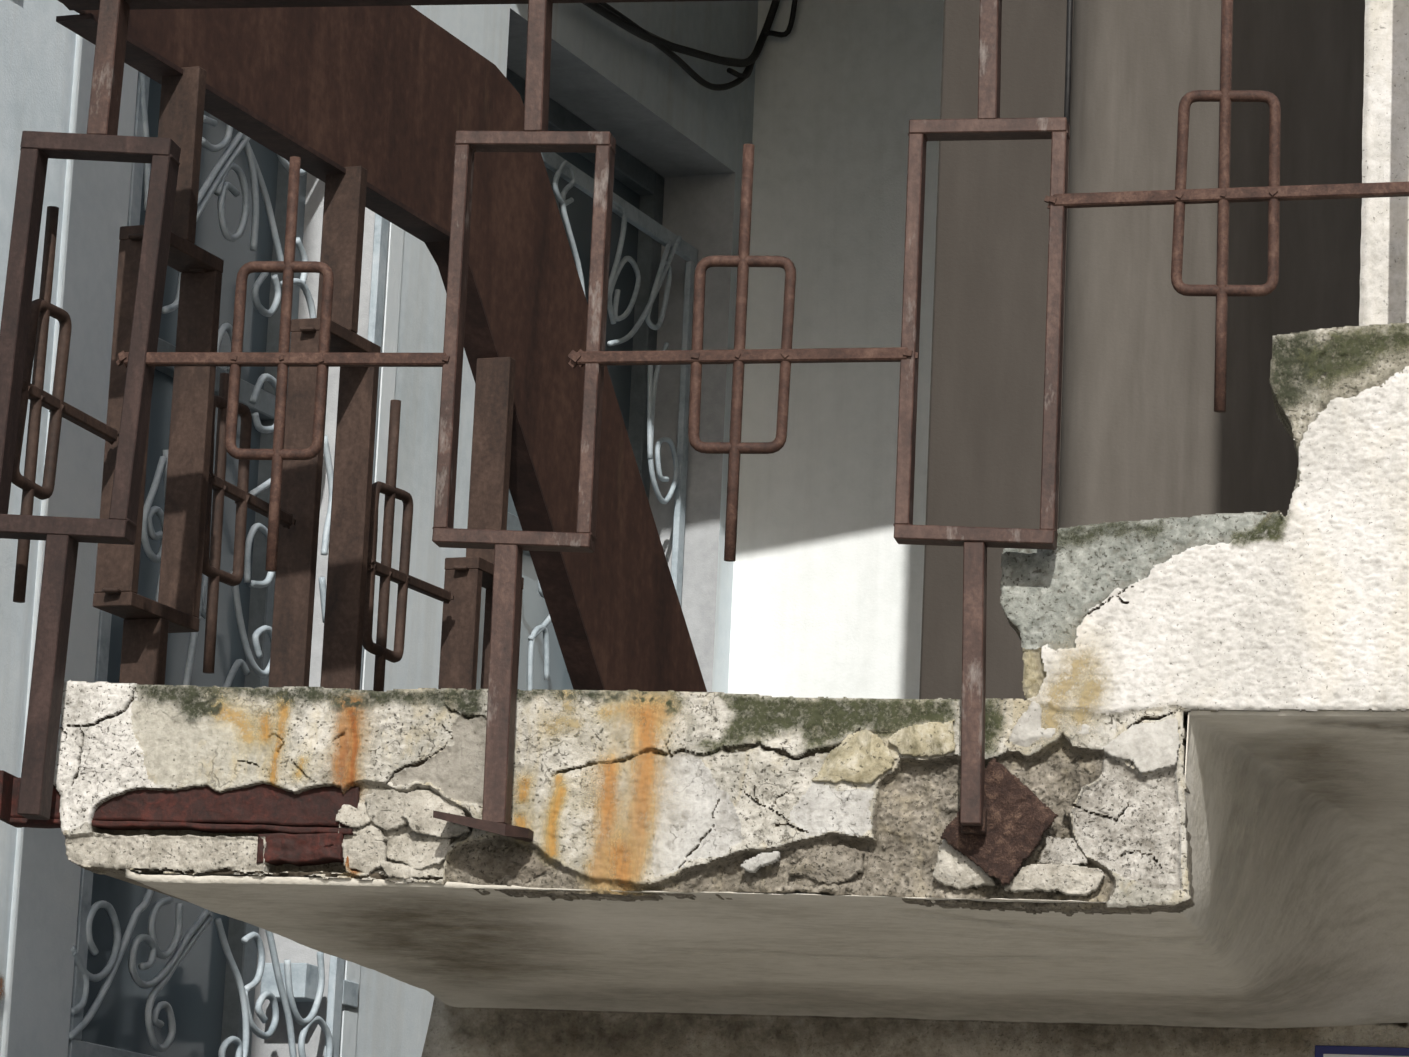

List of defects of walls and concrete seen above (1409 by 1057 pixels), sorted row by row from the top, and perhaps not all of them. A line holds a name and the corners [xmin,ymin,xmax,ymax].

flaking render [1270,323,1409,493]
crack [61,687,136,785]
rust [214,701,289,788]
rust [333,699,363,793]
rust [587,698,669,895]
spalling [64,510,1282,912]
crack [552,727,861,867]